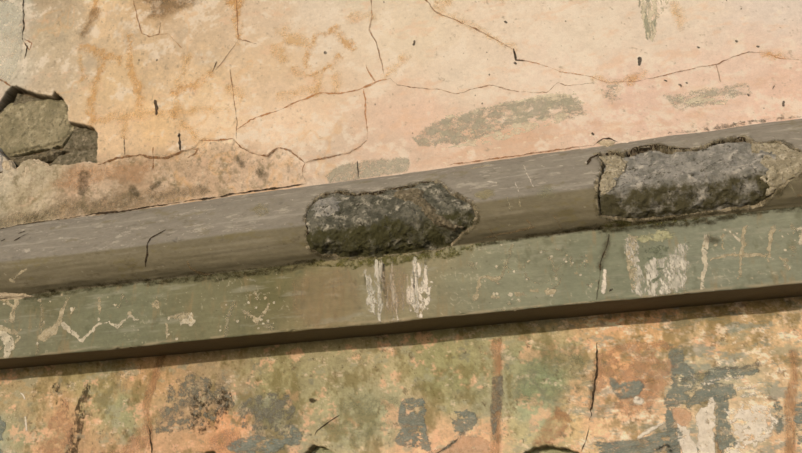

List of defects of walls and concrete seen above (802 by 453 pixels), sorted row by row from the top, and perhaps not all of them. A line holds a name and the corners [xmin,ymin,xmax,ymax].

flaking render [0,93,98,172]
crack [1,0,791,229]
spalling [304,158,479,260]
spalling [587,132,802,298]
damp [364,257,433,322]
peeling [155,374,303,453]
peeling [395,376,503,453]
flaking render [531,427,574,453]
crack [581,344,598,451]